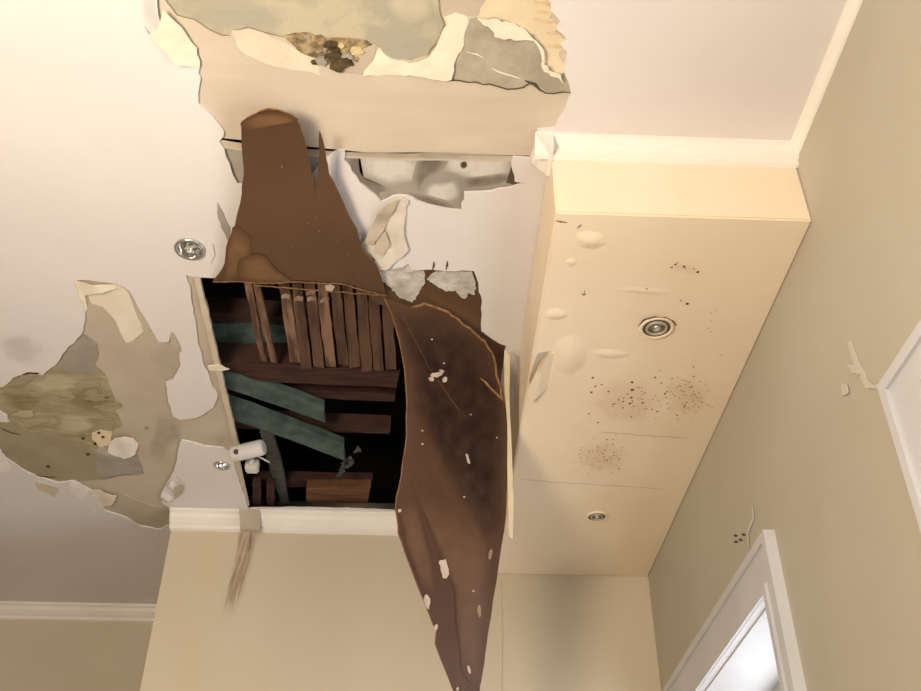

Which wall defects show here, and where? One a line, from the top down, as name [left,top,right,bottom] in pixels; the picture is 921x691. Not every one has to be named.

peeling [150,0,571,183]
flaking render [0,275,240,528]
water stain [586,366,713,428]
flaking render [234,461,249,506]
water stain [571,438,630,475]
water stain [192,508,261,620]
peeling [439,559,449,579]